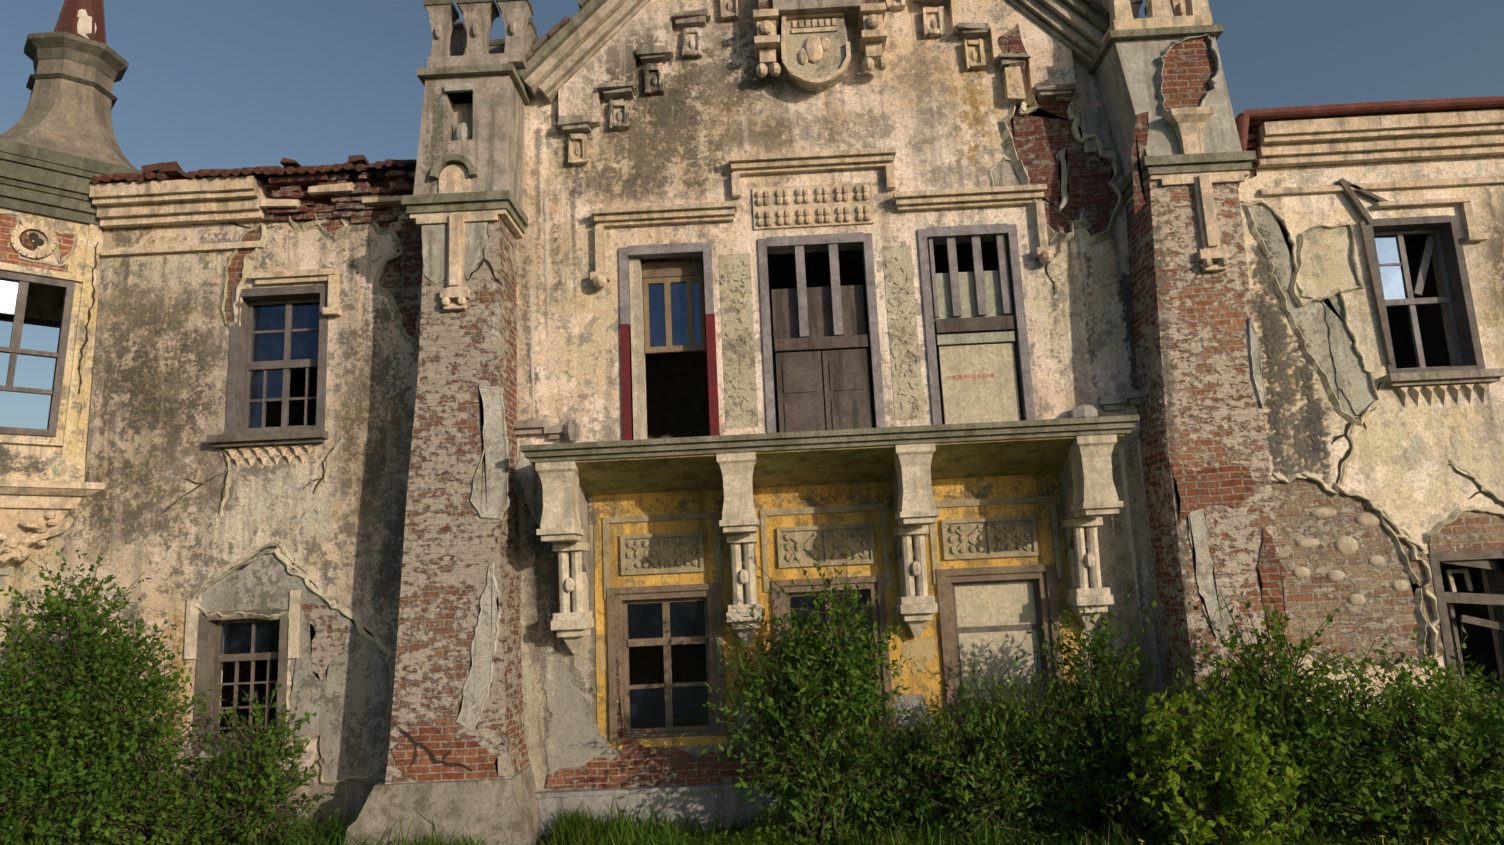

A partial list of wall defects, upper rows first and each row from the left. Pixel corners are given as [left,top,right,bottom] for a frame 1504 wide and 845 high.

flaking render [987,23,1148,246]
flaking render [367,206,423,355]
crack [1241,199,1298,274]
damp [1250,224,1332,491]
crack [1318,295,1387,490]
damp [1374,197,1504,252]
crack [157,448,232,518]
crack [192,437,346,599]
flaking render [1172,463,1504,671]
crack [1448,461,1504,507]
flaking render [193,548,498,786]
flaking render [539,635,1118,790]